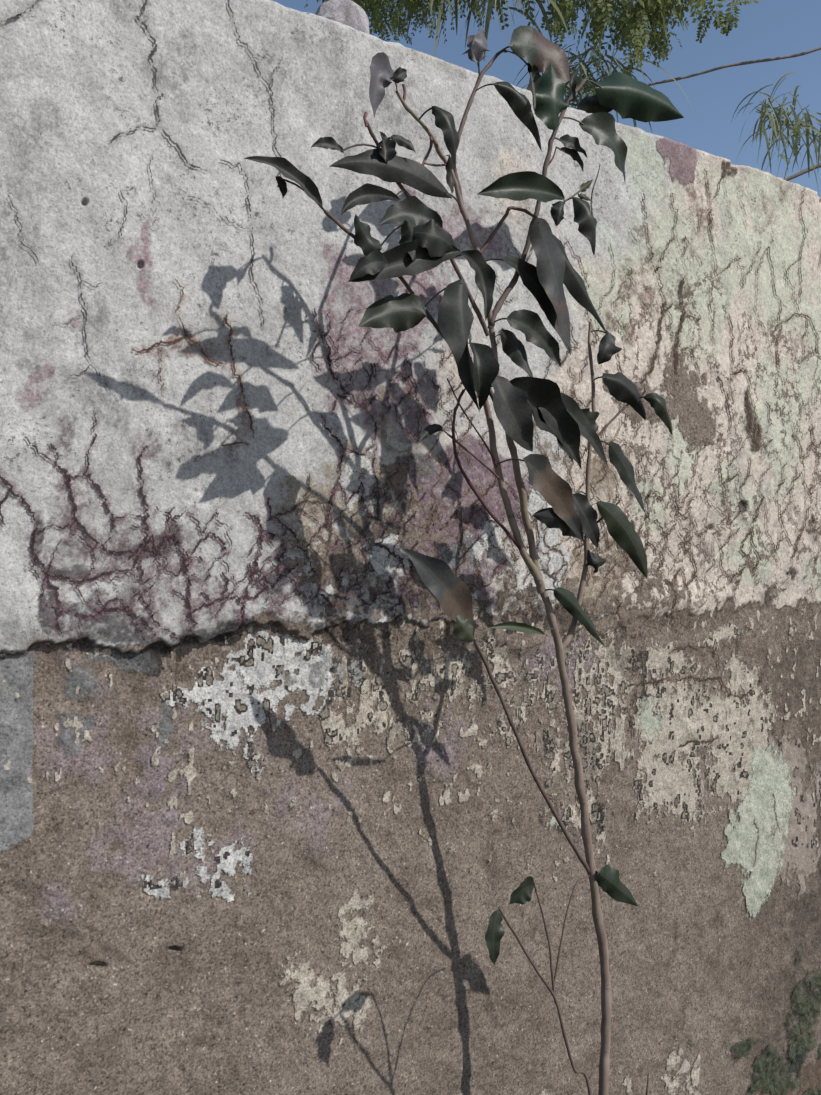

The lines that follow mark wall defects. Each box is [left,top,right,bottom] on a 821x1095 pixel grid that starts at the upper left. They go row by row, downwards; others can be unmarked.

crack [0,0,38,24]
crack [228,0,283,176]
crack [110,0,265,326]
crack [0,169,821,648]
peeling [161,449,821,918]
crack [628,645,769,738]
crack [679,737,718,747]
peeling [137,826,253,902]
peeling [279,887,387,1045]
peeling [622,1073,633,1095]
peeling [661,1042,701,1095]